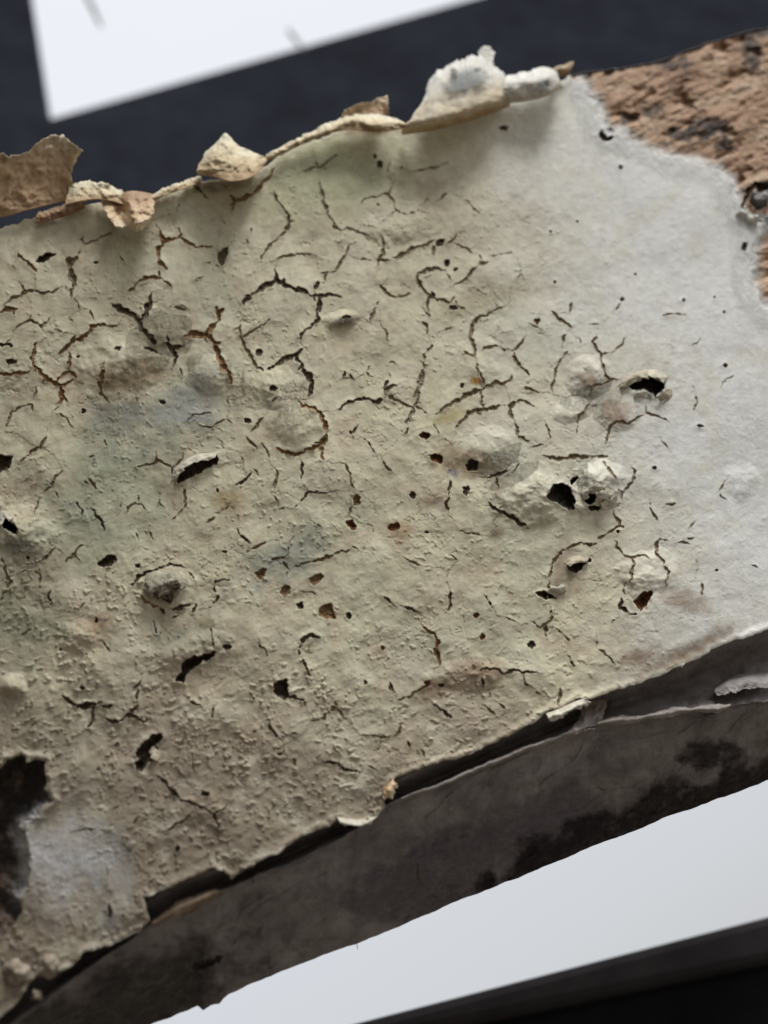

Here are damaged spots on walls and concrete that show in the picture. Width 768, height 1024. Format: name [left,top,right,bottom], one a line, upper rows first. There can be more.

spalling [0,30,768,301]
crack [0,154,704,667]
crack [29,659,154,748]
crack [249,596,452,773]
crack [479,667,562,716]
peeling [546,697,590,722]
flaking render [714,671,768,696]
spalling [0,754,52,939]
crack [156,738,227,866]
water stain [349,742,768,917]
water stain [21,937,223,1024]